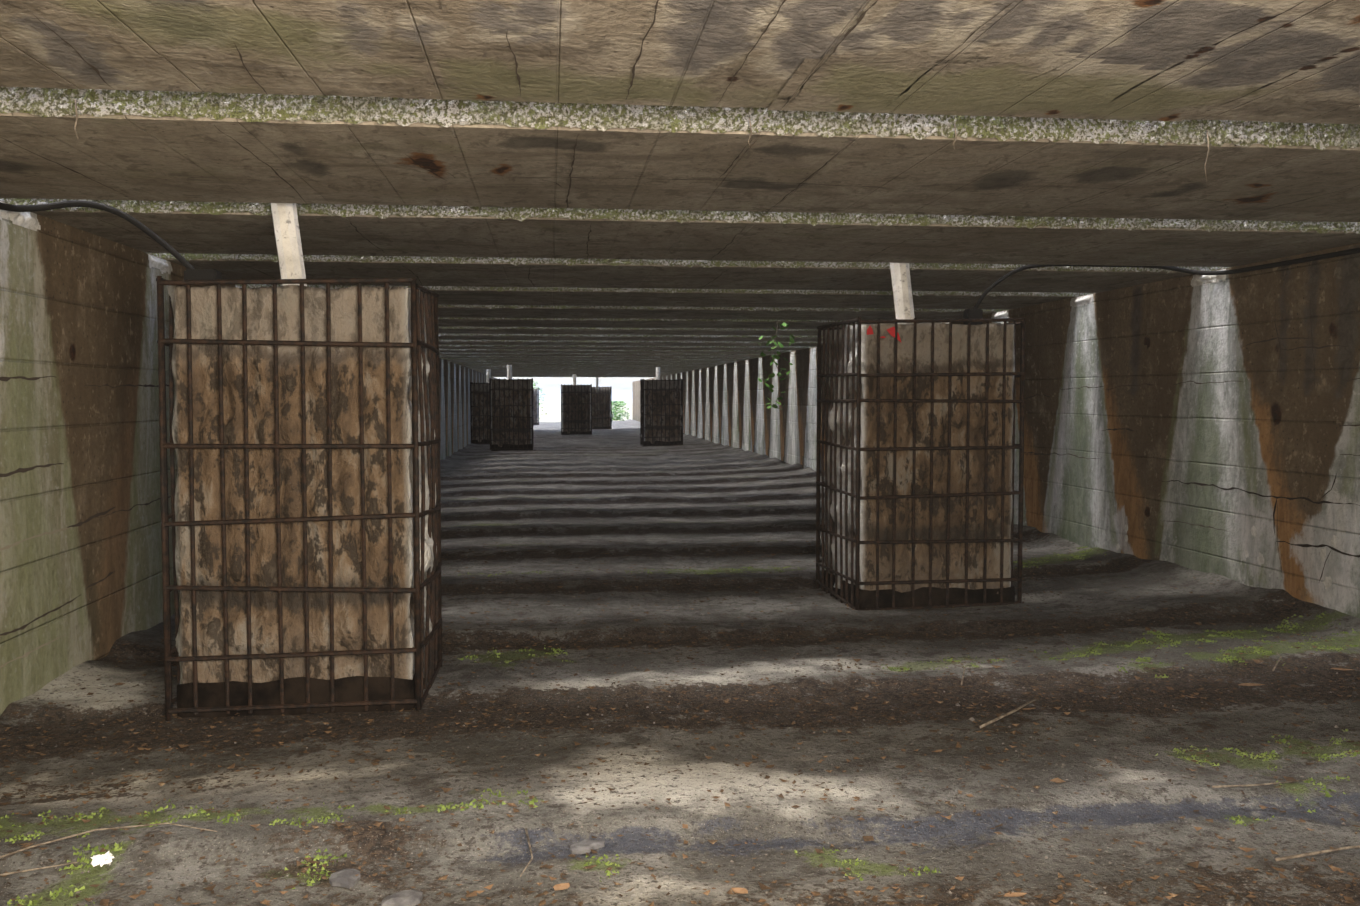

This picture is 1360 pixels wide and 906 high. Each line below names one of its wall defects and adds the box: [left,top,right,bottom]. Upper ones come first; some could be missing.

crack [626,0,659,99]
crack [719,0,786,102]
damp [299,0,1360,114]
crack [789,0,878,104]
crack [886,1,1014,107]
damp [0,201,89,716]
damp [116,253,180,640]
corrosion [1010,309,1059,536]
crack [1159,473,1360,581]